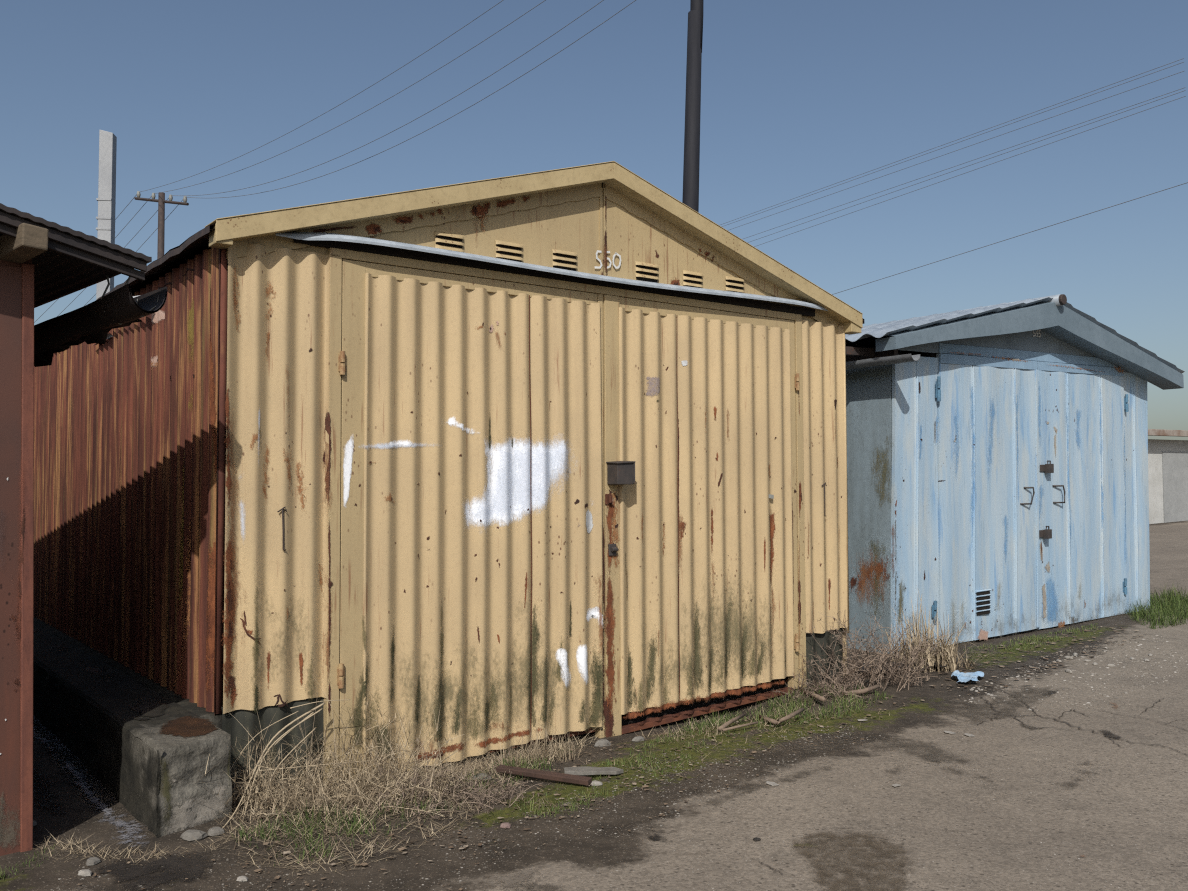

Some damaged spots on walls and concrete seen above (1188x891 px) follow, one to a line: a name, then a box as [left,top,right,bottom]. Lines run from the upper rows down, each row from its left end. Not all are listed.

rust [206,320,238,706]
rust [323,412,331,503]
rust [665,410,694,556]
rust [319,526,333,716]
leakage [368,709,392,758]
rust [416,723,542,762]
leakage [411,601,572,736]
leakage [580,661,603,723]
leakage [638,640,667,709]
rust [586,501,795,738]
leakage [683,601,770,696]
leakage [794,832,910,891]